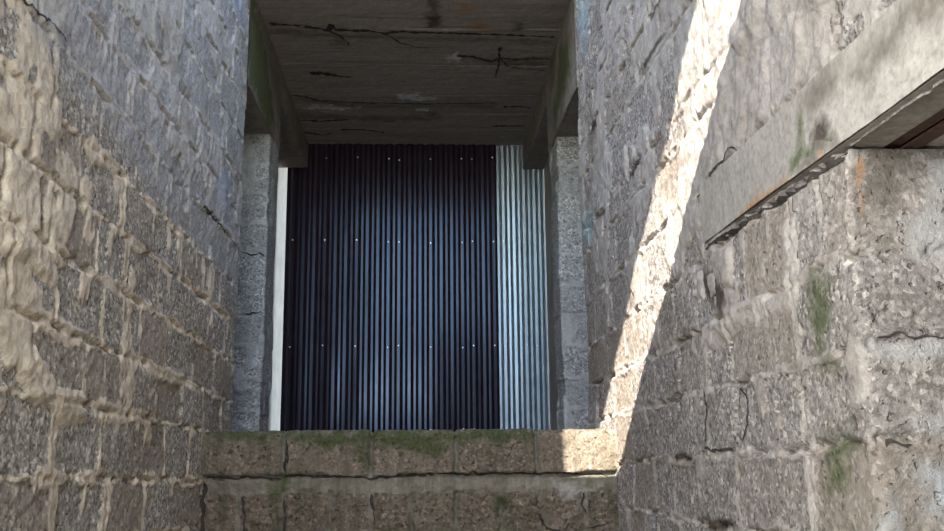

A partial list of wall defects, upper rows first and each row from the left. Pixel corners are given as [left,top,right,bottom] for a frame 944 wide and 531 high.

crack [269,22,555,77]
crack [291,71,531,135]
crack [877,331,944,339]